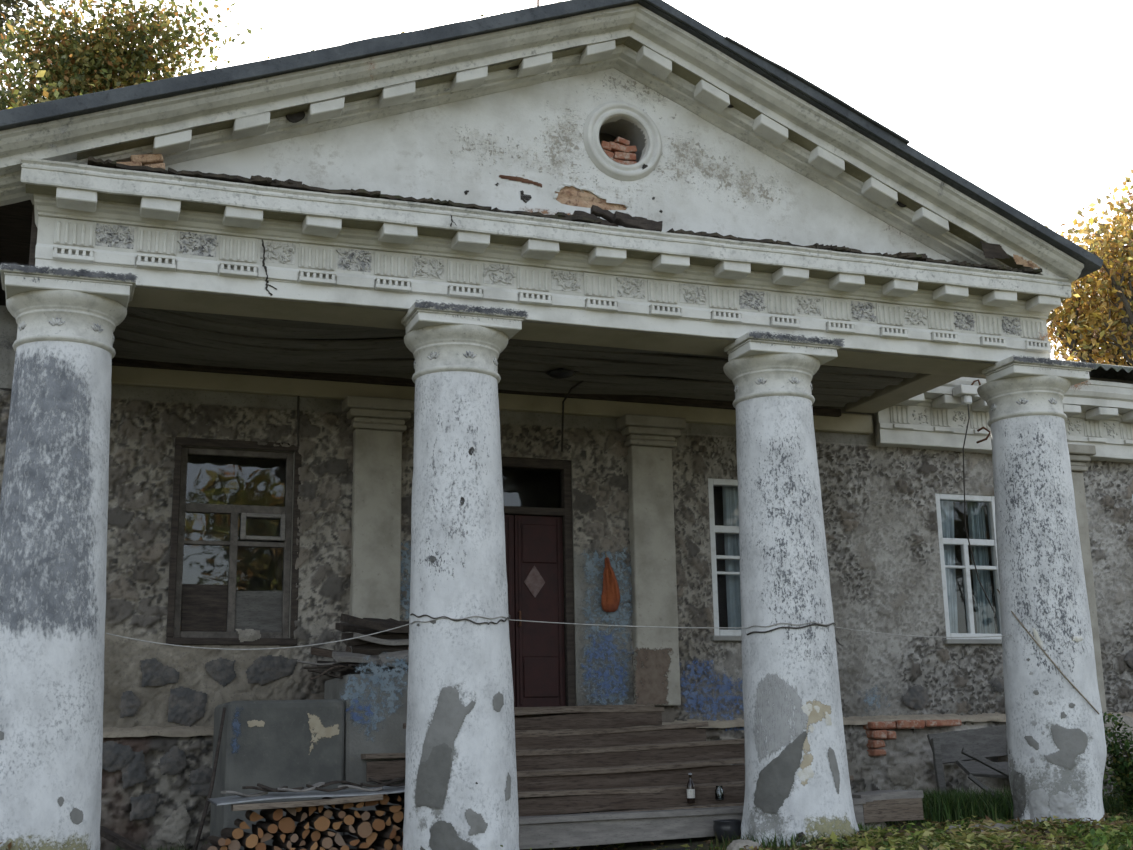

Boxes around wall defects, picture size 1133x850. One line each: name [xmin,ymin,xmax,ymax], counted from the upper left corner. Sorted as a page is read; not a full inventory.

flaking render [495,175,629,210]
crack [262,239,277,296]
damp [0,341,98,636]
peeling [581,548,744,732]
peeling [307,656,408,755]
peeling [797,700,832,786]
flaking render [420,808,488,850]